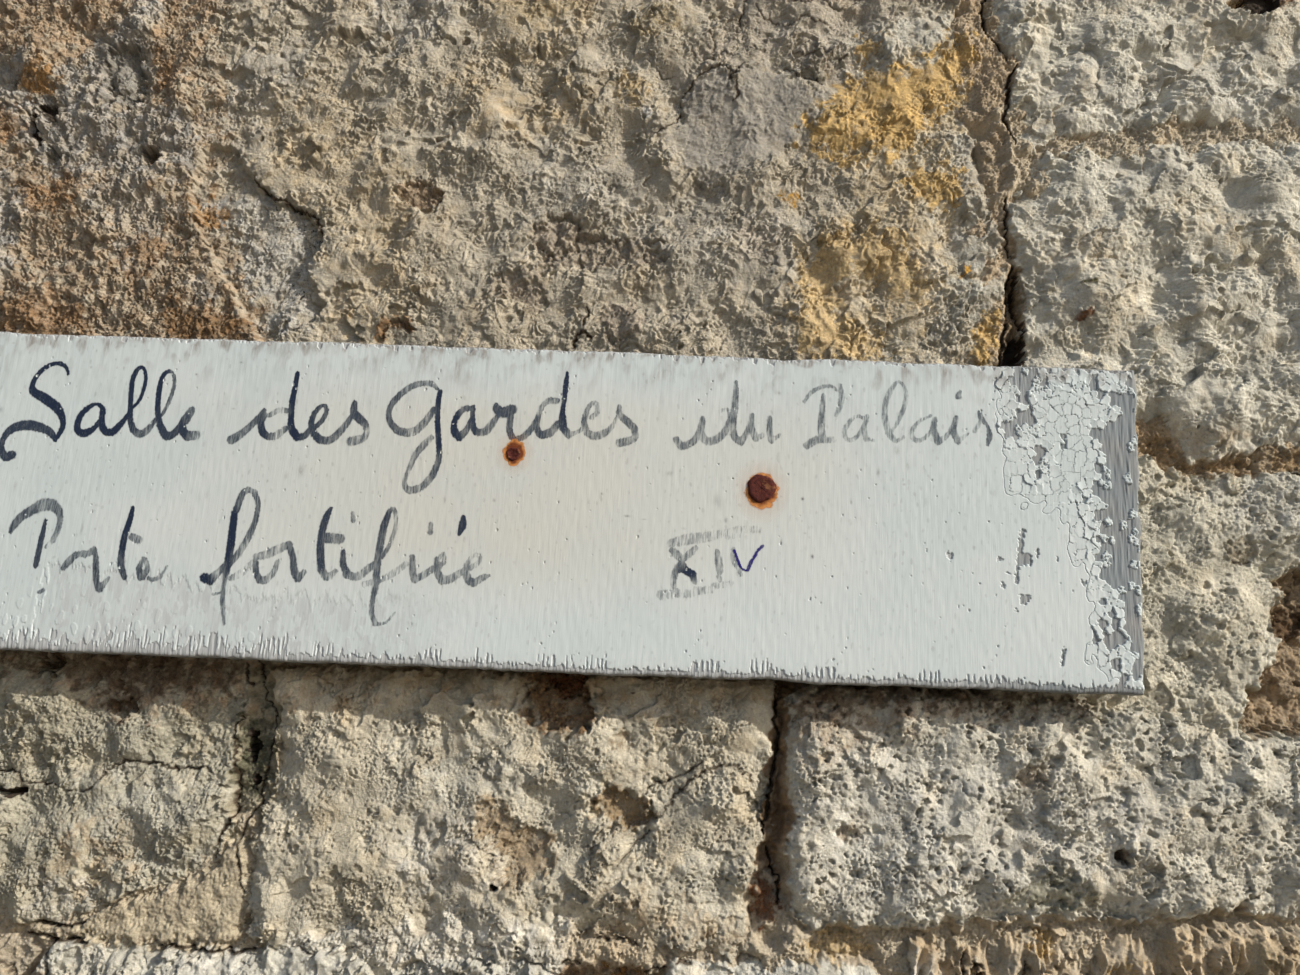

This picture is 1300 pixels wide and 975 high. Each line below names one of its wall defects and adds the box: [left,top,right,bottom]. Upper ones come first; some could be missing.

crack [980,0,1016,145]
crack [255,180,323,244]
crack [996,198,1026,367]
spalling [1240,571,1300,738]
crack [0,660,278,891]
crack [617,684,780,903]
crack [0,919,88,975]
crack [162,944,256,955]